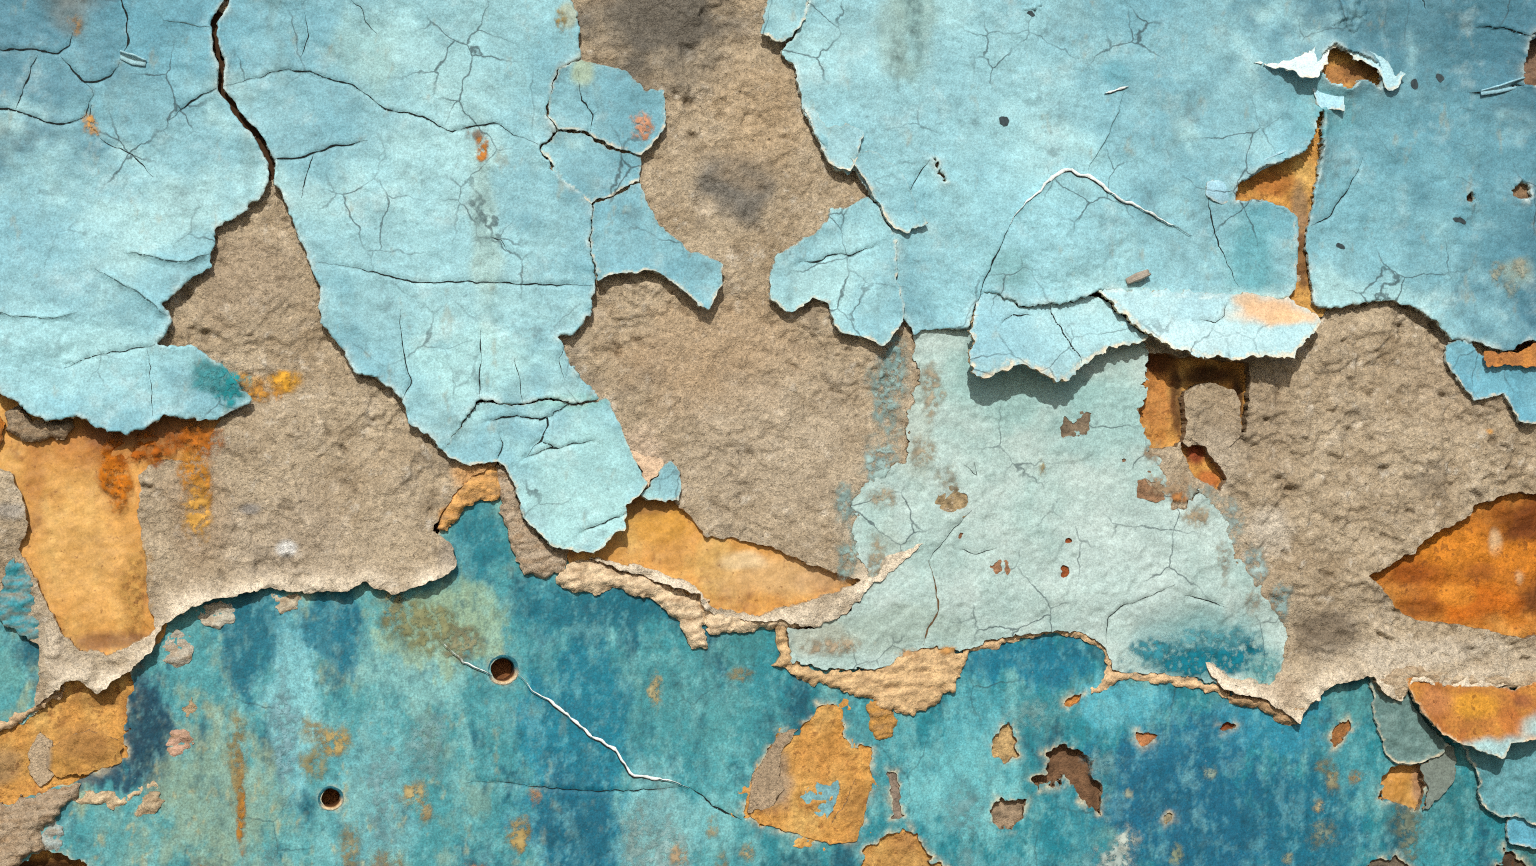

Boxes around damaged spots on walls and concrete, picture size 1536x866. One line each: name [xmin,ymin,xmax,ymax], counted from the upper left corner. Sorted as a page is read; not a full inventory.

crack [0,0,152,176]
crack [165,0,533,198]
crack [65,347,153,416]
crack [97,252,211,316]
crack [318,237,577,402]
spalling [0,0,968,805]
crack [971,86,1238,321]
spalling [967,38,1536,866]
spalling [19,850,87,866]
crack [438,640,740,819]
spalling [731,699,942,866]